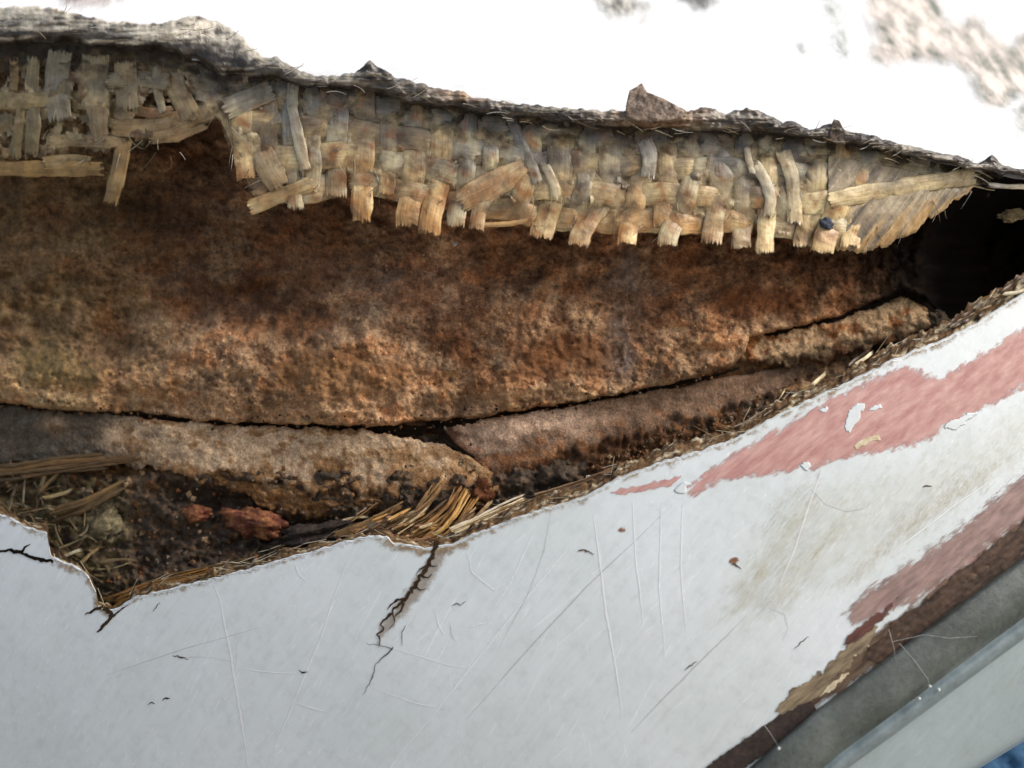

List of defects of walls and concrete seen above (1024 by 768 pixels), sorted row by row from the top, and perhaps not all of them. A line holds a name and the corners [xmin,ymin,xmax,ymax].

peeling [626,83,686,123]
peeling [828,119,846,144]
peeling [869,0,1024,128]
crack [754,289,939,337]
crack [0,367,740,459]
peeling [611,329,1024,497]
crack [0,544,54,563]
peeling [844,475,1024,625]
crack [363,540,440,694]